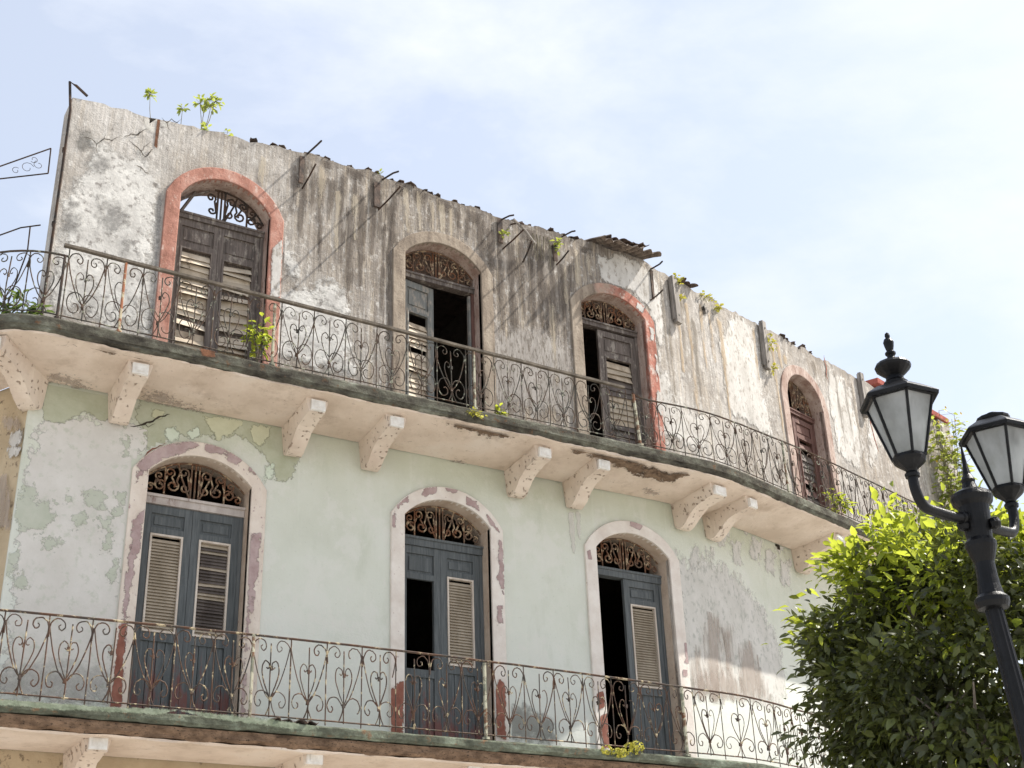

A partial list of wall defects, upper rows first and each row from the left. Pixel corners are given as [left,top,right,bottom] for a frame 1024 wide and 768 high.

damp [95,194,127,231]
crack [86,118,180,174]
peeling [0,385,299,717]
crack [131,414,169,455]
damp [292,161,427,341]
damp [439,199,574,415]
spalling [571,449,690,483]
peeling [596,253,715,450]